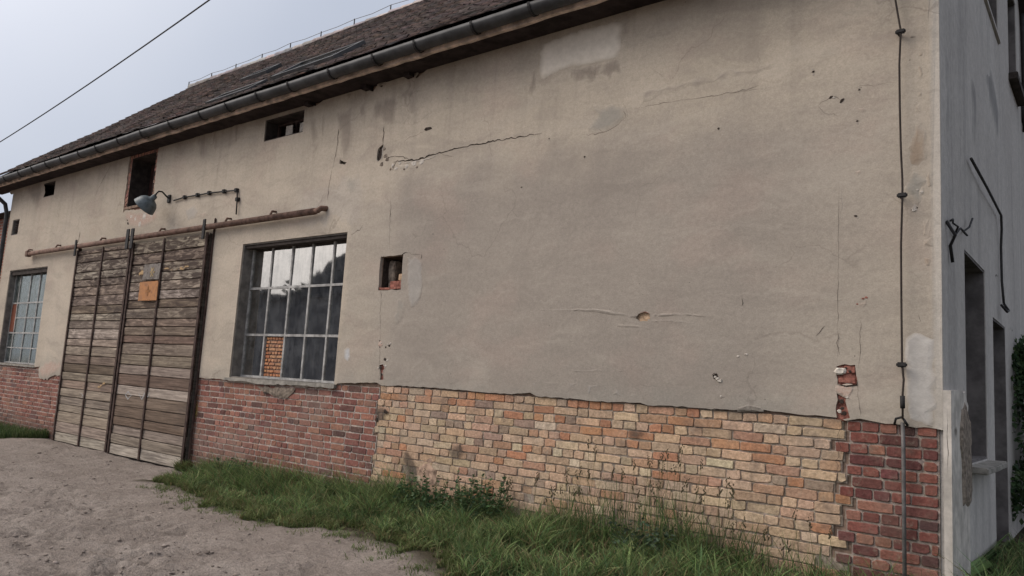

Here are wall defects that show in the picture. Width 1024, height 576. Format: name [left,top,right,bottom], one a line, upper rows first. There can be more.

crack [383,126,536,170]
crack [817,190,861,415]
spalling [834,364,857,421]